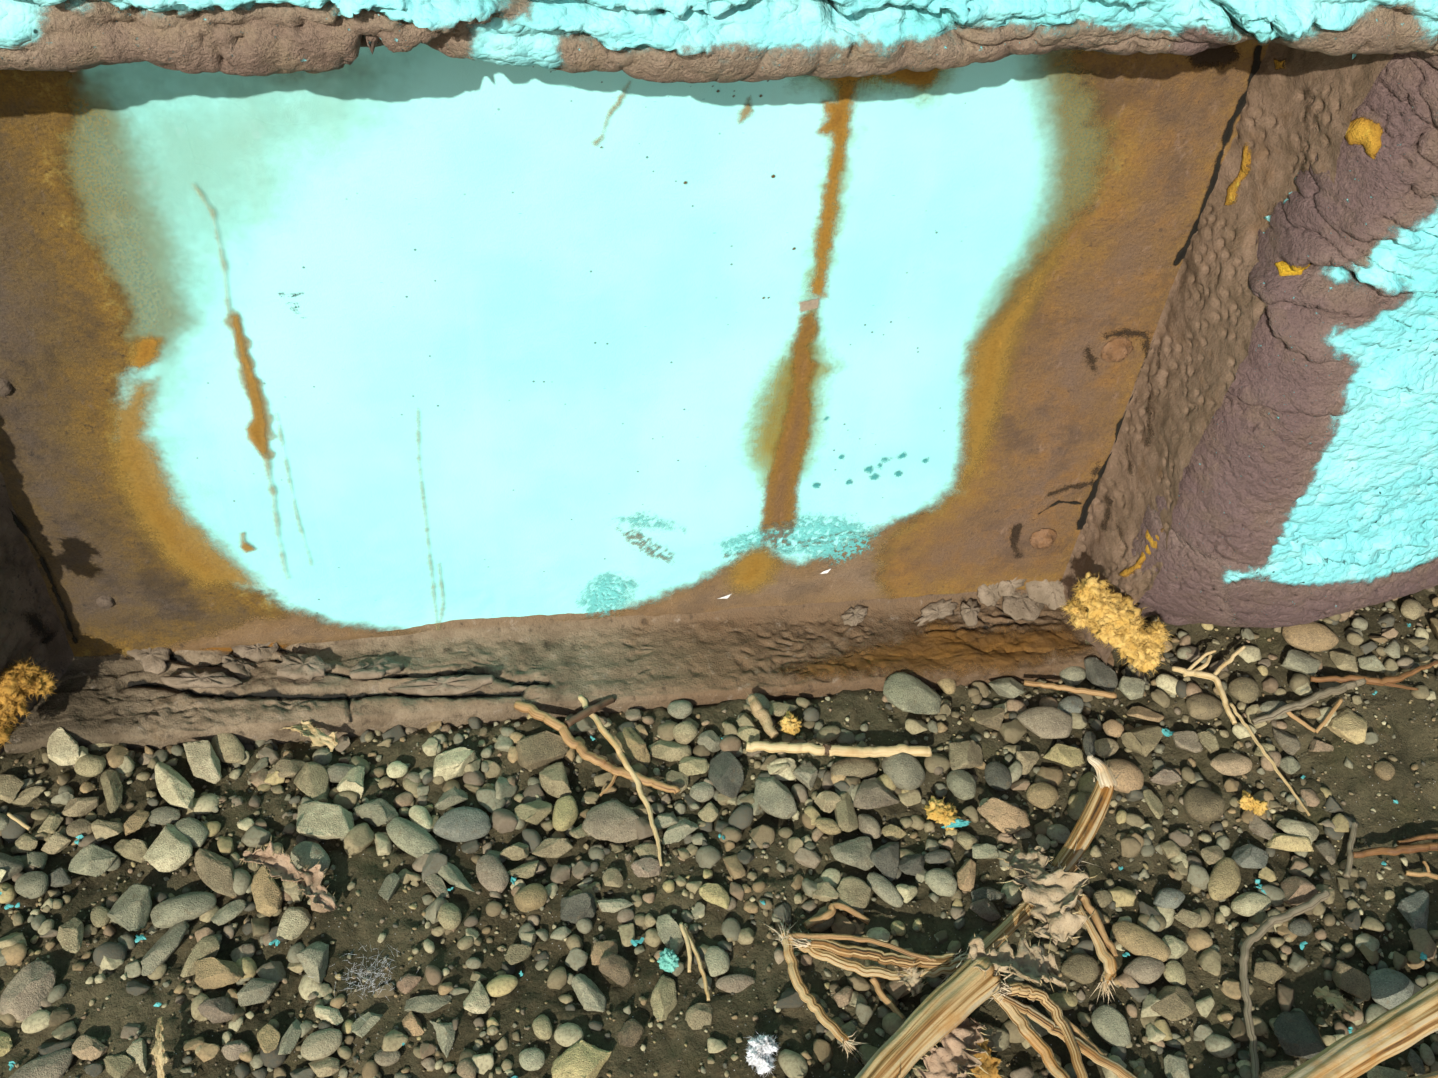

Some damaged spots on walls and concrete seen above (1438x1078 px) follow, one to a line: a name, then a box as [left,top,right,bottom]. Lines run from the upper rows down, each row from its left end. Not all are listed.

spalling [1186,43,1239,70]
crack [1173,0,1262,266]
corrosion [583,39,1270,620]
corrosion [0,70,415,659]
crack [1009,328,1155,558]
peeling [841,605,868,626]
peeling [997,577,1067,610]
peeling [127,642,332,689]
peeling [349,657,494,697]